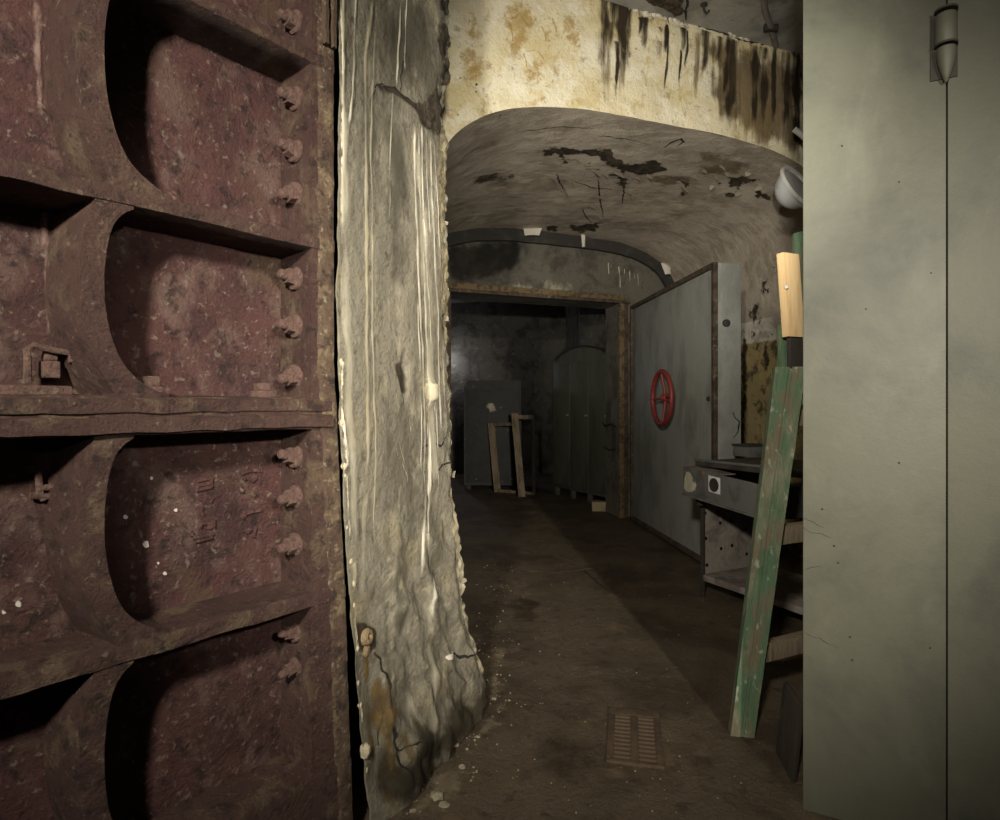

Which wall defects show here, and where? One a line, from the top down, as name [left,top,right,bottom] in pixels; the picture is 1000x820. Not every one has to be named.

water stain [391,0,426,80]
water stain [506,4,533,53]
water stain [601,0,803,150]
water stain [340,0,376,463]
peeling [524,228,542,236]
peeling [543,147,667,223]
peeling [676,165,771,200]
water stain [390,123,445,565]
water stain [338,278,357,533]
corrosion [356,623,413,774]
crack [374,652,423,769]